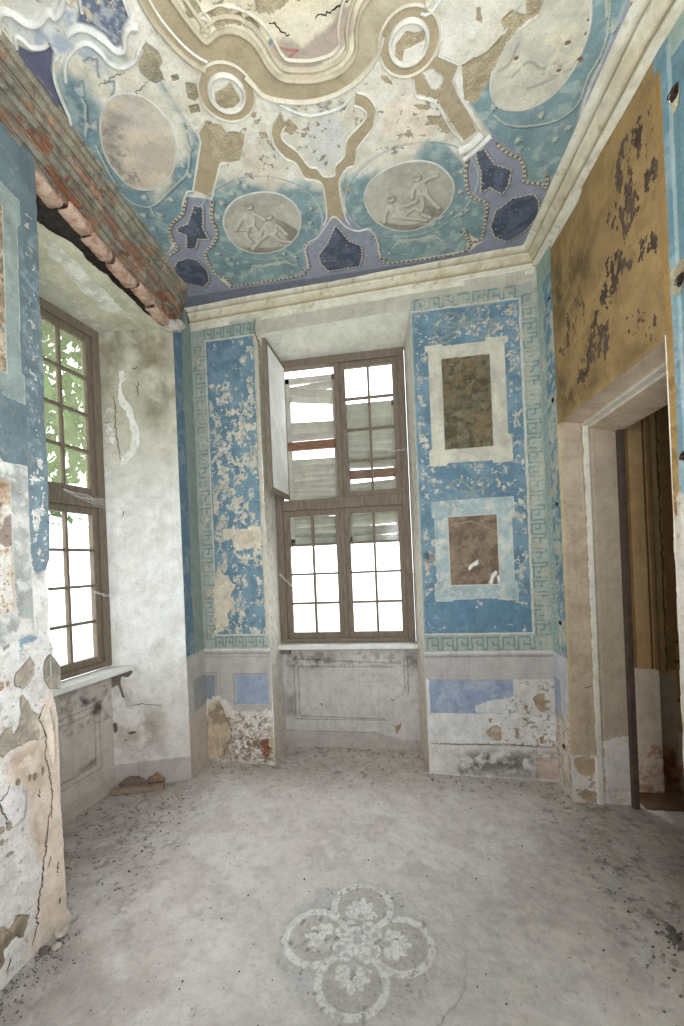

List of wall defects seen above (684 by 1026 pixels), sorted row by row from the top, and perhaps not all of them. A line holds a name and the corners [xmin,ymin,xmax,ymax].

crack [315,0,349,19]
flaking render [132,0,544,185]
peeling [538,104,658,647]
peeling [29,448,47,562]
peeling [196,336,266,637]
peeling [414,302,529,609]
flaking render [0,654,61,758]
flaking render [207,700,275,763]
flaking render [486,718,503,741]
flaking render [0,821,14,857]
crack [32,704,61,944]
flaking render [0,914,30,969]